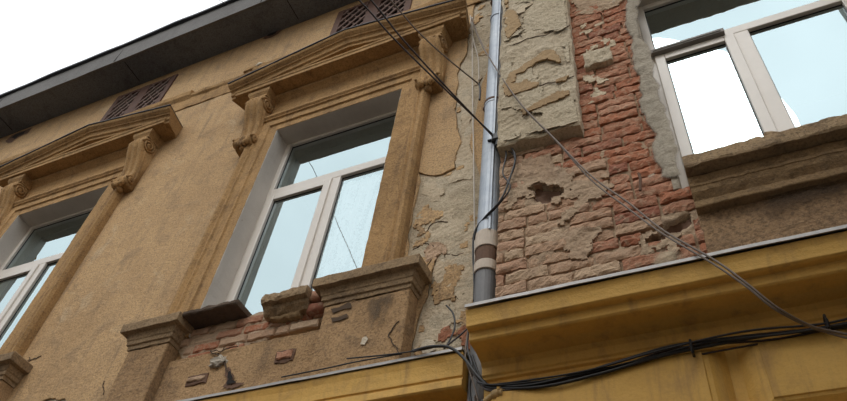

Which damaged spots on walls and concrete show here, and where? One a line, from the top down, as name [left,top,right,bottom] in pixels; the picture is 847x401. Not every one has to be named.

flaking render [495,0,707,298]
peeling [408,0,492,356]
flaking render [185,373,209,387]
spalling [223,367,244,389]
flaking render [178,310,324,359]
flaking render [274,348,296,364]